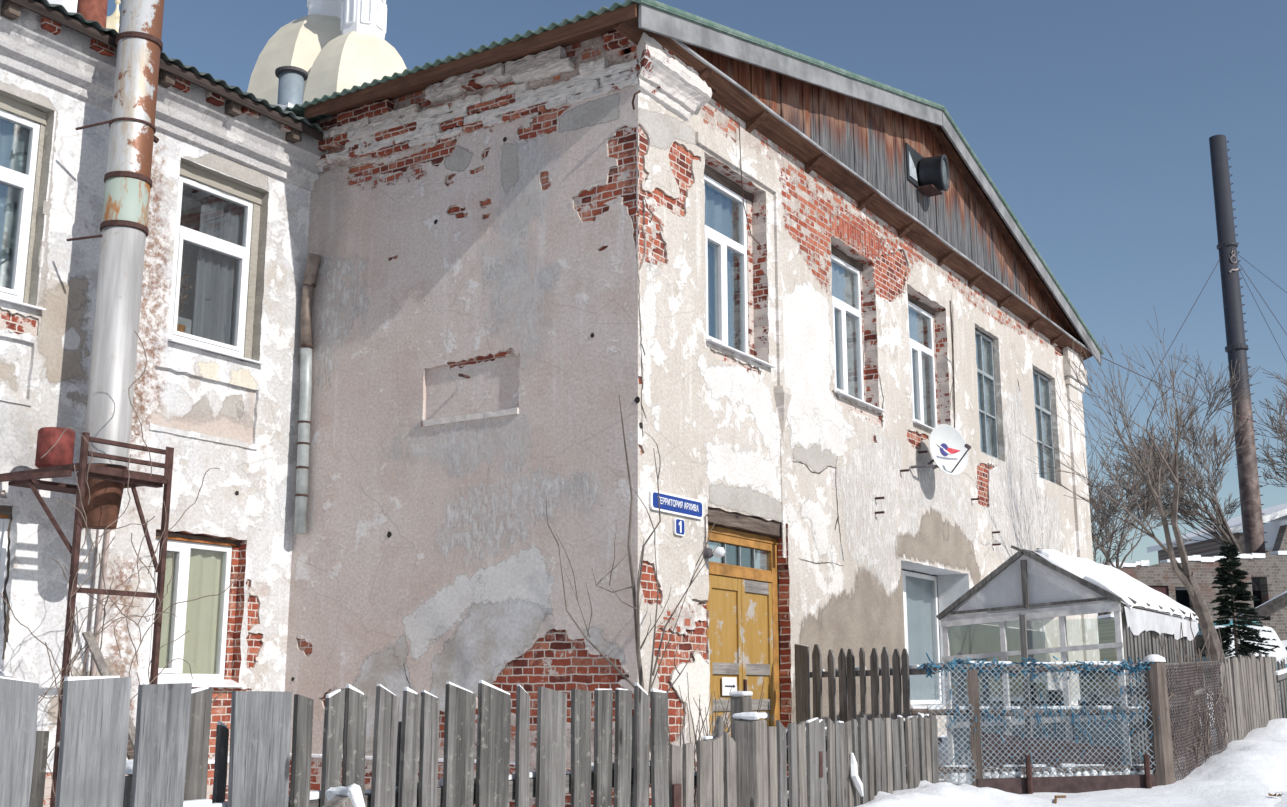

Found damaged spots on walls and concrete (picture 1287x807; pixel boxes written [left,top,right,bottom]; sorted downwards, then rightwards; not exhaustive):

flaking render [322,36,637,190]
flaking render [0,277,90,405]
rust [131,150,167,435]
flaking render [151,389,255,444]
flaking render [570,125,699,432]
flaking render [697,102,1063,723]
rust [108,562,140,678]
flaking render [192,687,250,759]
flaking render [246,579,269,670]
peeling [353,459,598,753]
flaking render [490,626,634,750]
flaking render [641,561,710,746]